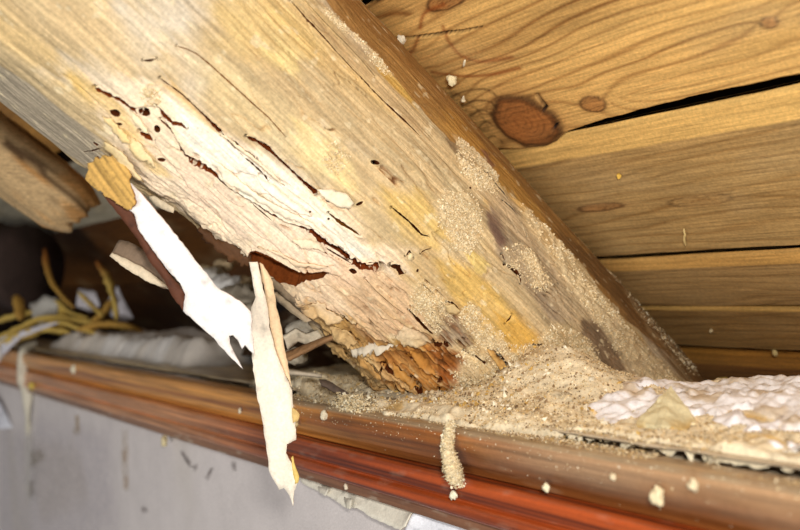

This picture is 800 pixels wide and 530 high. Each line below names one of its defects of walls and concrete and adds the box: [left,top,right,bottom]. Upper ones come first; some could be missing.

crack [83,144,123,153]
peeling [101,116,155,183]
peeling [130,110,150,134]
peeling [211,132,338,253]
crack [95,44,508,365]
peeling [317,189,354,210]
peeling [300,301,436,391]